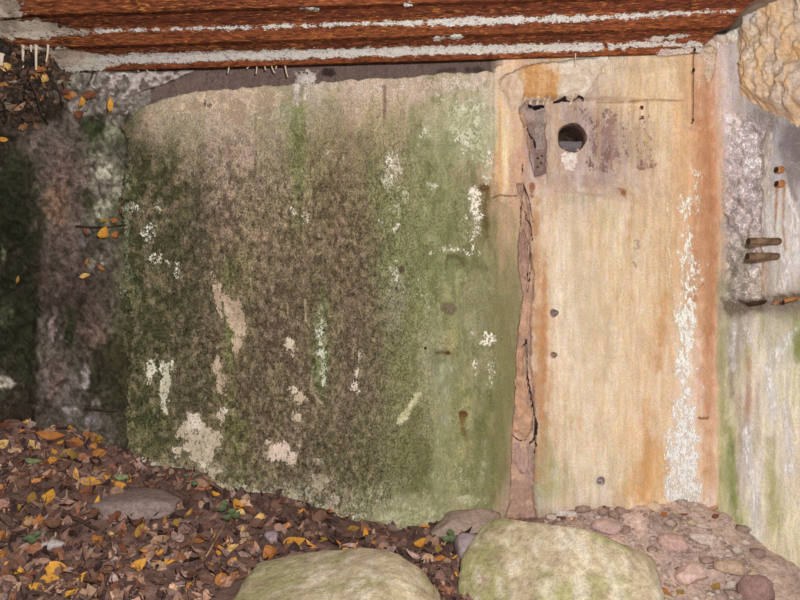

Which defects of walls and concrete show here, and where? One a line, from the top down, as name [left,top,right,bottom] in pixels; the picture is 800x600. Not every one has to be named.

spalling [519,100,547,176]
peeling [172,354,265,493]
peeling [211,271,249,357]
peeling [265,433,301,469]
efflorescence [304,299,328,405]
damp [374,411,488,527]
damp [430,331,497,401]
crack [512,339,538,459]
efflorescence [659,154,708,503]